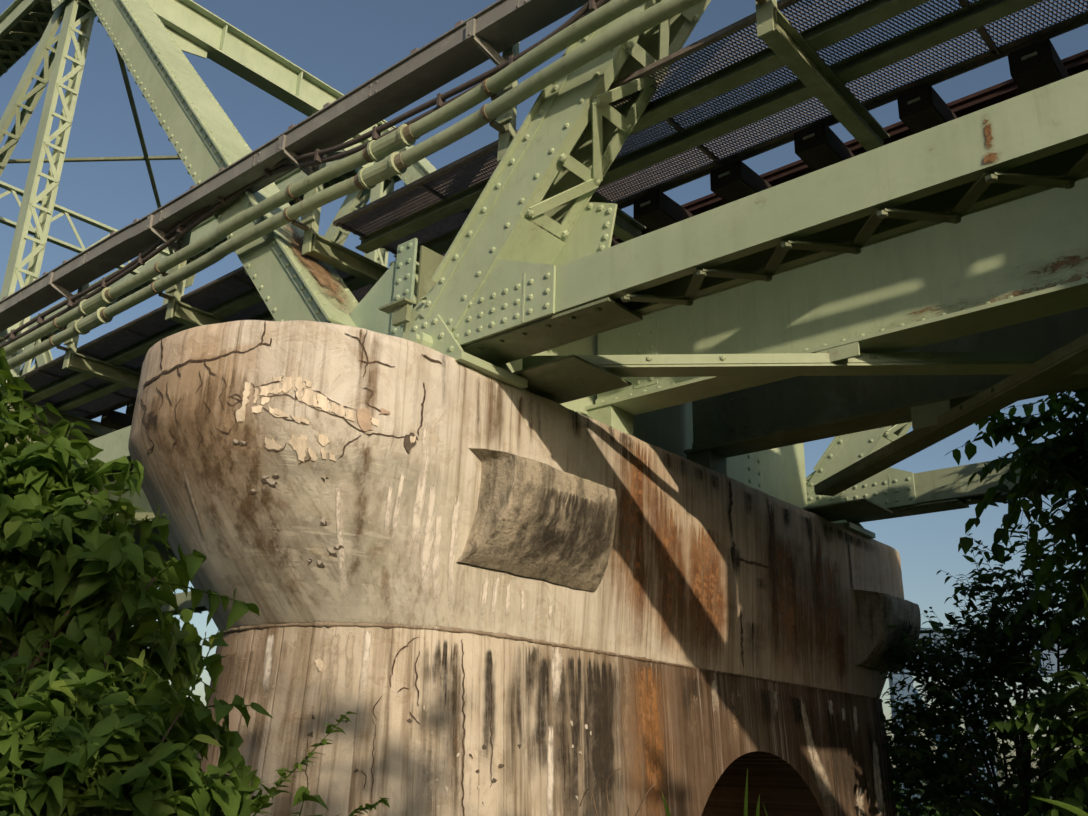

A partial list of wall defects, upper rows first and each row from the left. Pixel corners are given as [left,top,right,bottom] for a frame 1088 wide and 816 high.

corrosion [983,119,1002,163]
corrosion [984,252,1088,305]
crack [140,322,442,464]
peeling [236,376,391,462]
corrosion [617,444,726,640]
crack [728,480,776,603]
water stain [426,642,457,710]
water stain [484,651,495,747]
water stain [511,647,629,815]
crack [738,608,746,667]